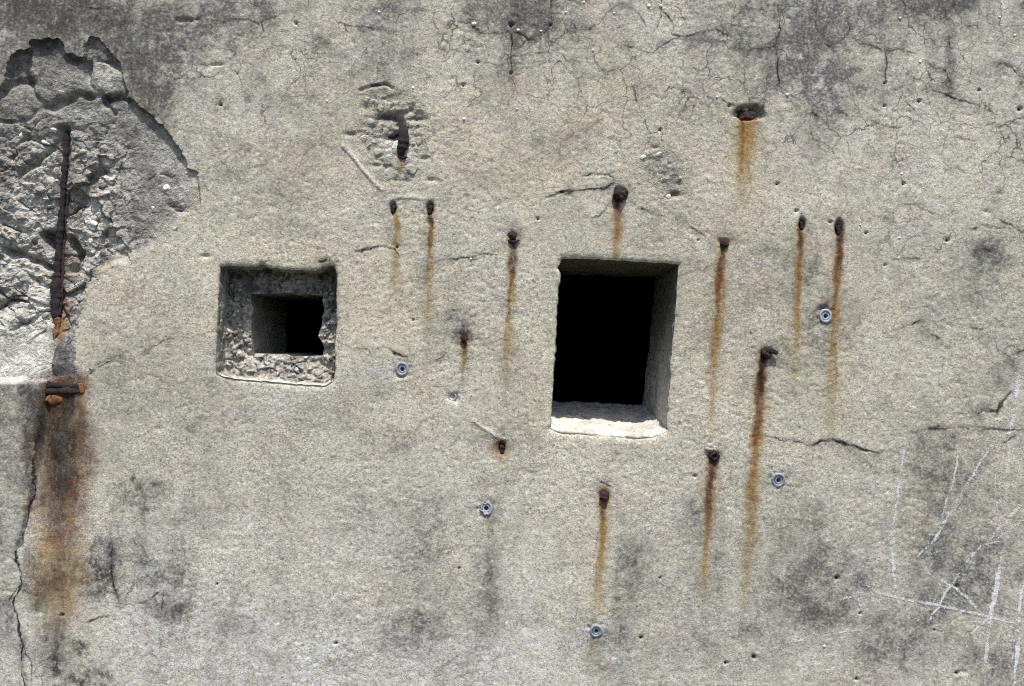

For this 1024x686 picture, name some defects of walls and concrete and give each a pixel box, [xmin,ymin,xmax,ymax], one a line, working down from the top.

crack [462,5,617,66]
crack [628,12,729,53]
corrosion [49,131,71,340]
spalling [0,36,201,384]
spalling [351,85,431,193]
crack [550,173,614,216]
corrosion [711,246,725,371]
corrosion [831,229,844,323]
crack [9,400,45,686]
corrosion [28,375,92,608]
corrosion [746,355,767,538]
crack [772,437,876,453]